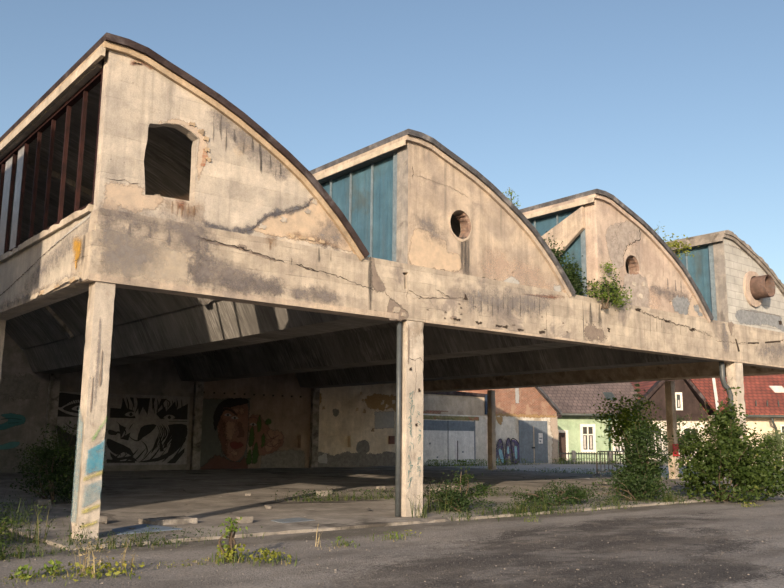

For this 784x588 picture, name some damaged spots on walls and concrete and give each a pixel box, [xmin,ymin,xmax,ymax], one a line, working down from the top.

flaking render [158,119,211,179]
damp [213,113,287,178]
corrosion [73,240,81,269]
damp [101,210,279,293]
crack [197,236,381,292]
peeling [408,228,463,272]
peeling [605,221,650,308]
spalling [385,292,409,321]
damp [469,289,549,313]
crack [635,308,781,352]
peeling [355,392,396,414]